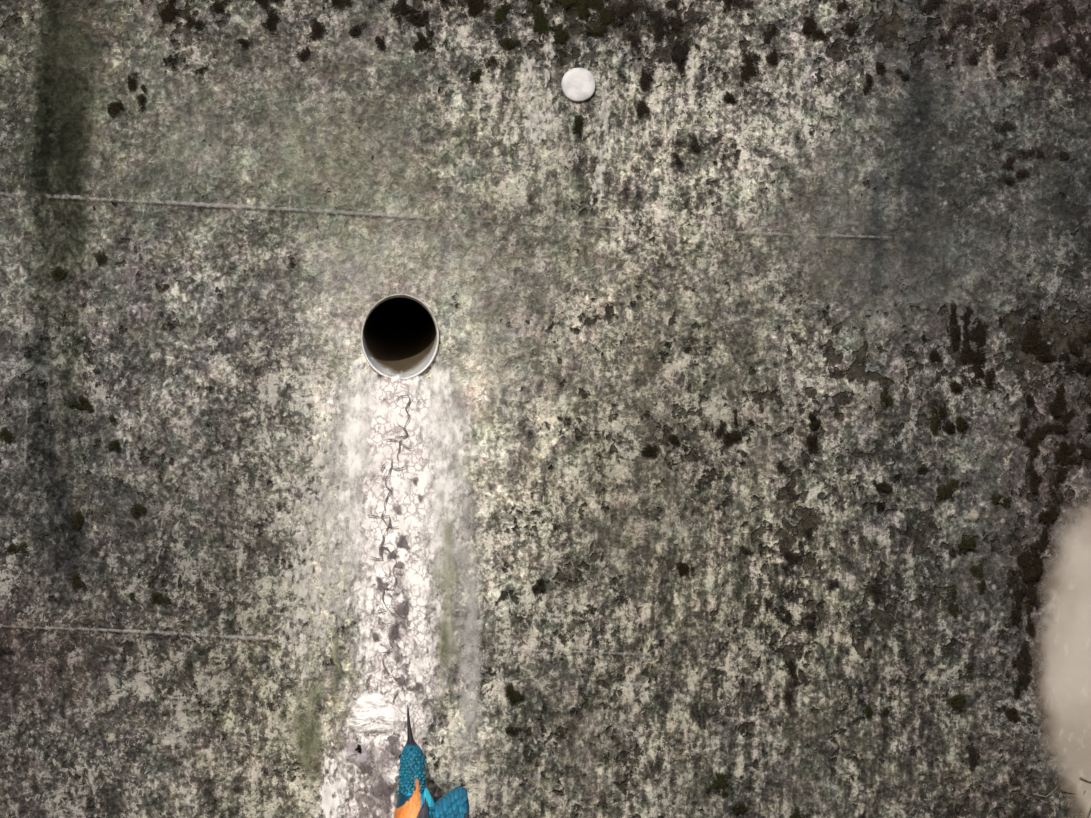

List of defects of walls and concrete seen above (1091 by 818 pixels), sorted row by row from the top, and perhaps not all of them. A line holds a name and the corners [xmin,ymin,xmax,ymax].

efflorescence [521,37,555,148]
efflorescence [590,72,612,207]
water stain [276,353,475,818]
crack [367,394,419,680]